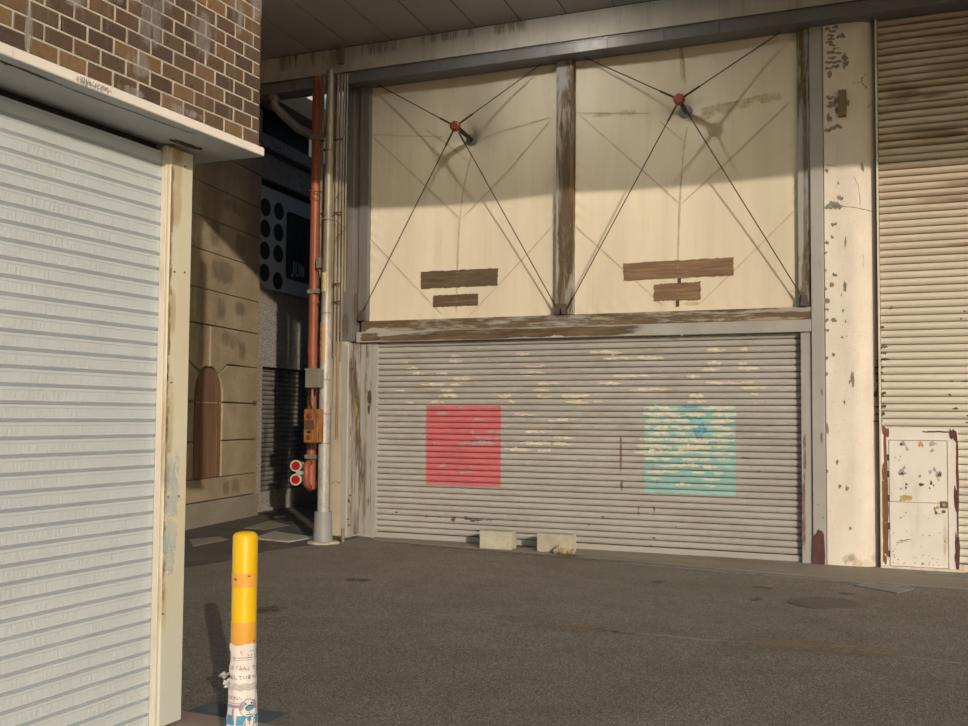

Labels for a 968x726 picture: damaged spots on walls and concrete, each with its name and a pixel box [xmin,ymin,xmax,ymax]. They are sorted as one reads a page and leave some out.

peeling [825,25,849,78]
peeling [824,95,849,132]
peeling [401,355,471,416]
peeling [516,353,602,404]
peeling [590,350,664,360]
peeling [599,375,673,392]
peeling [687,347,767,396]
peeling [458,418,573,452]
peeling [629,394,749,487]
corrosion [874,345,889,564]
peeling [895,440,942,501]
corrosion [922,429,960,570]